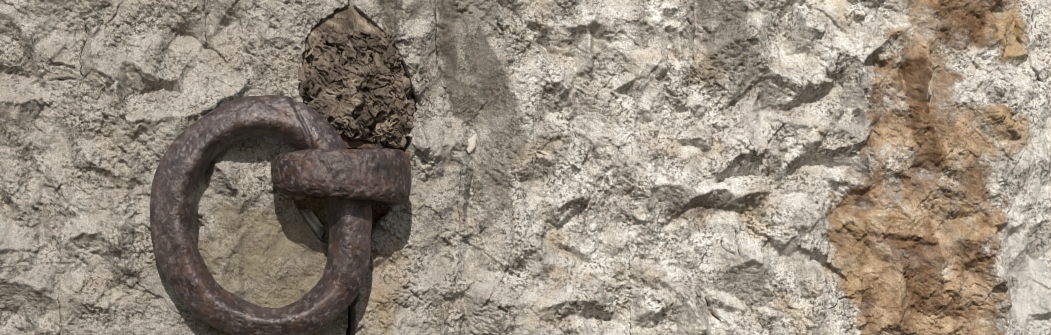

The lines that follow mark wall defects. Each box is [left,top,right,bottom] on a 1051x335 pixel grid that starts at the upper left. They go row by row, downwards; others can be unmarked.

crack [344,306,352,335]